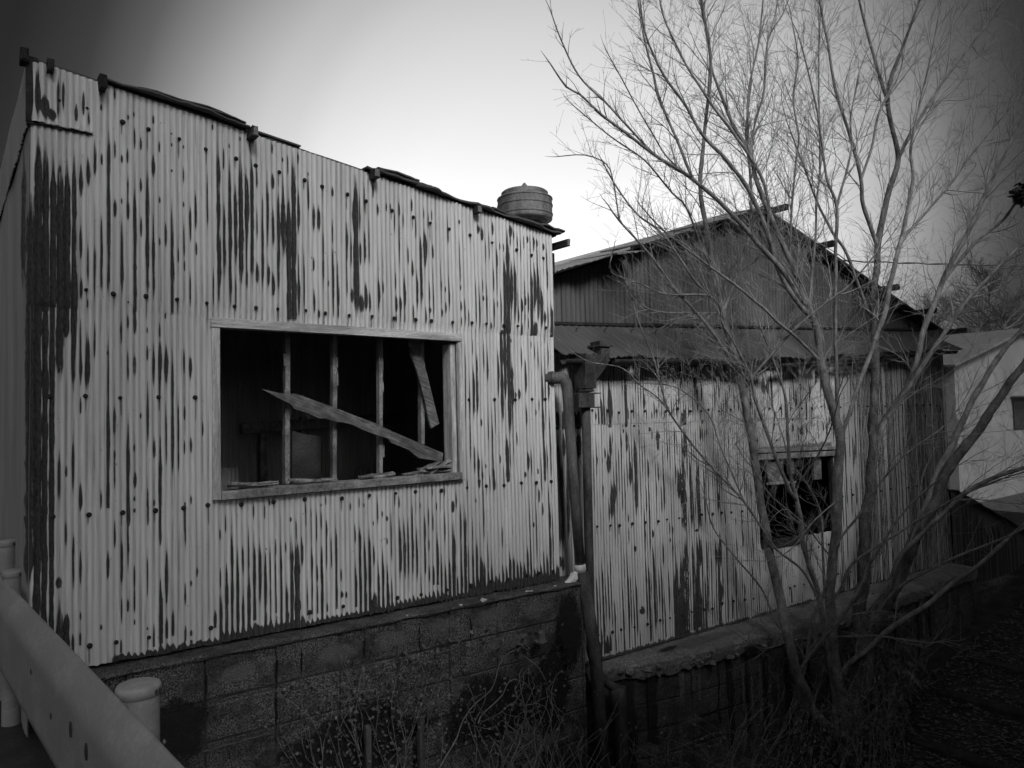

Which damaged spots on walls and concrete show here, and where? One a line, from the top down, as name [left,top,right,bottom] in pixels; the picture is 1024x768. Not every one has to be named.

corrosion [13,112,1024,664]